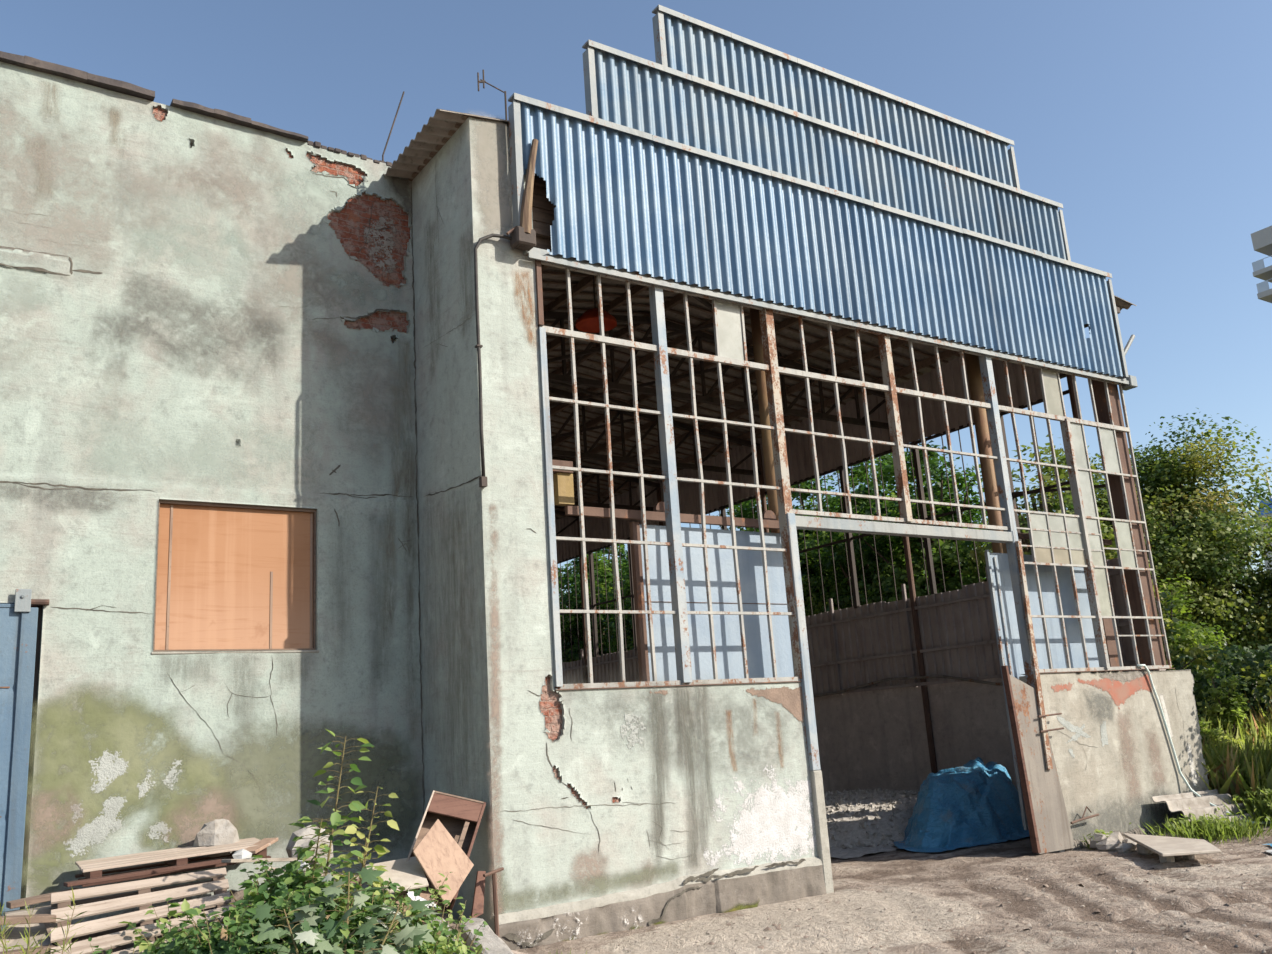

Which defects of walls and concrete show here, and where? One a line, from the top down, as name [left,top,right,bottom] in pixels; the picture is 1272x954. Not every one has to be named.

flaking render [286,149,412,289]
flaking render [340,309,409,333]
crack [0,481,155,492]
damp [35,748,182,858]
damp [146,795,232,847]
crack [168,659,278,790]
flaking render [539,675,567,742]
crack [496,709,806,925]
damp [618,686,817,871]